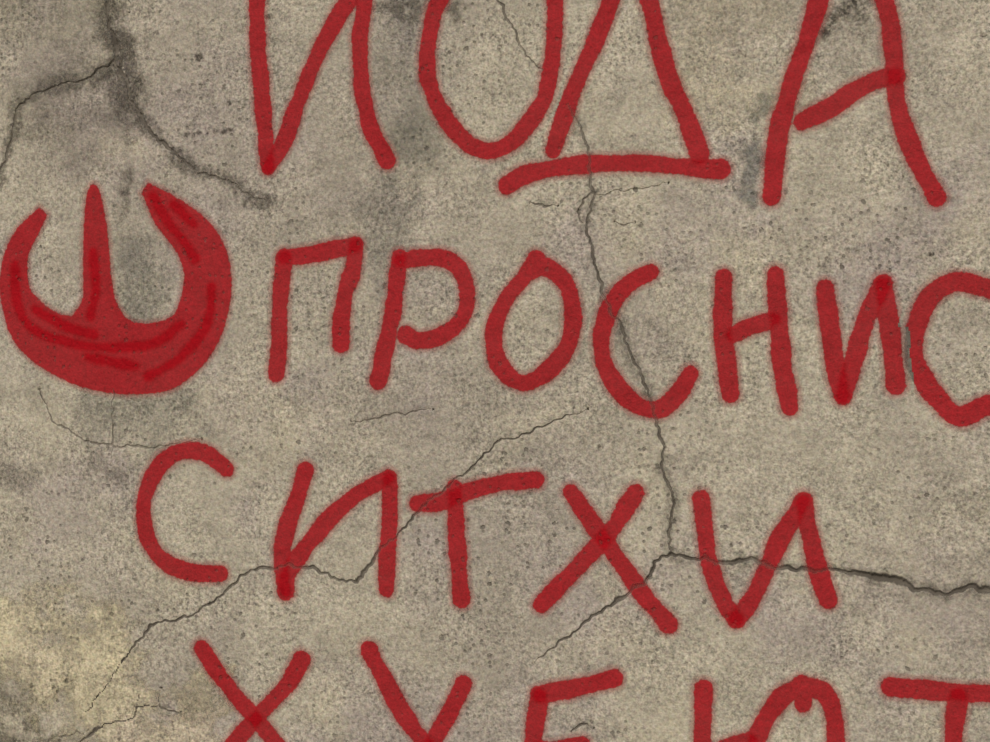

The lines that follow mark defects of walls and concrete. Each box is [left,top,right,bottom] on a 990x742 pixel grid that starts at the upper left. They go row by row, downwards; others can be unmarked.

crack [0,0,274,208]
crack [493,0,543,74]
crack [36,389,202,466]
crack [529,106,990,665]
crack [46,405,589,742]
crack [568,719,594,735]